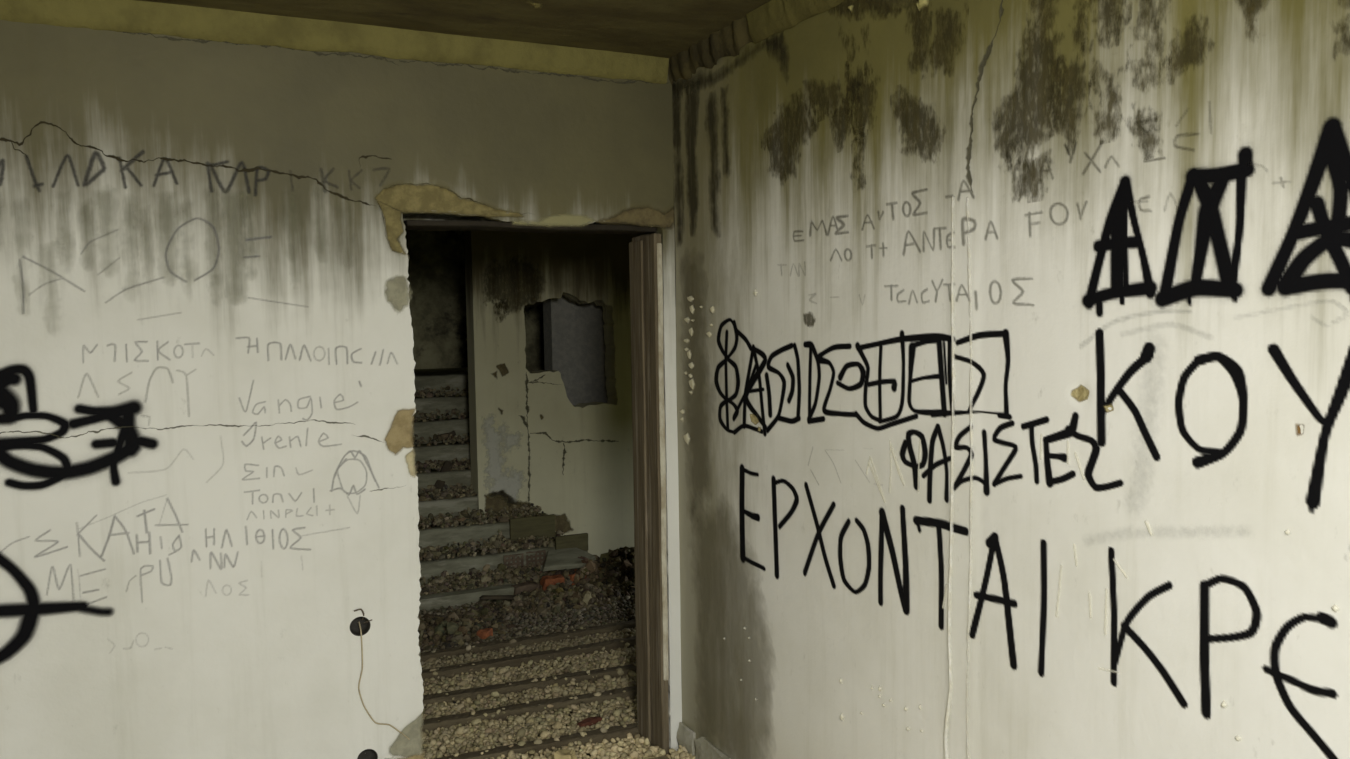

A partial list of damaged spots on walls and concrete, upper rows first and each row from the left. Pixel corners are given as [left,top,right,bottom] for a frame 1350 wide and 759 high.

water stain [831,0,961,73]
water stain [1240,0,1265,31]
water stain [672,60,738,241]
water stain [764,38,876,188]
water stain [895,92,940,159]
water stain [994,0,1204,199]
crack [0,121,485,253]
flaking render [375,184,675,255]
flaking render [493,363,509,378]
flaking render [385,409,415,477]
flaking render [485,490,531,517]
flaking render [555,514,573,534]